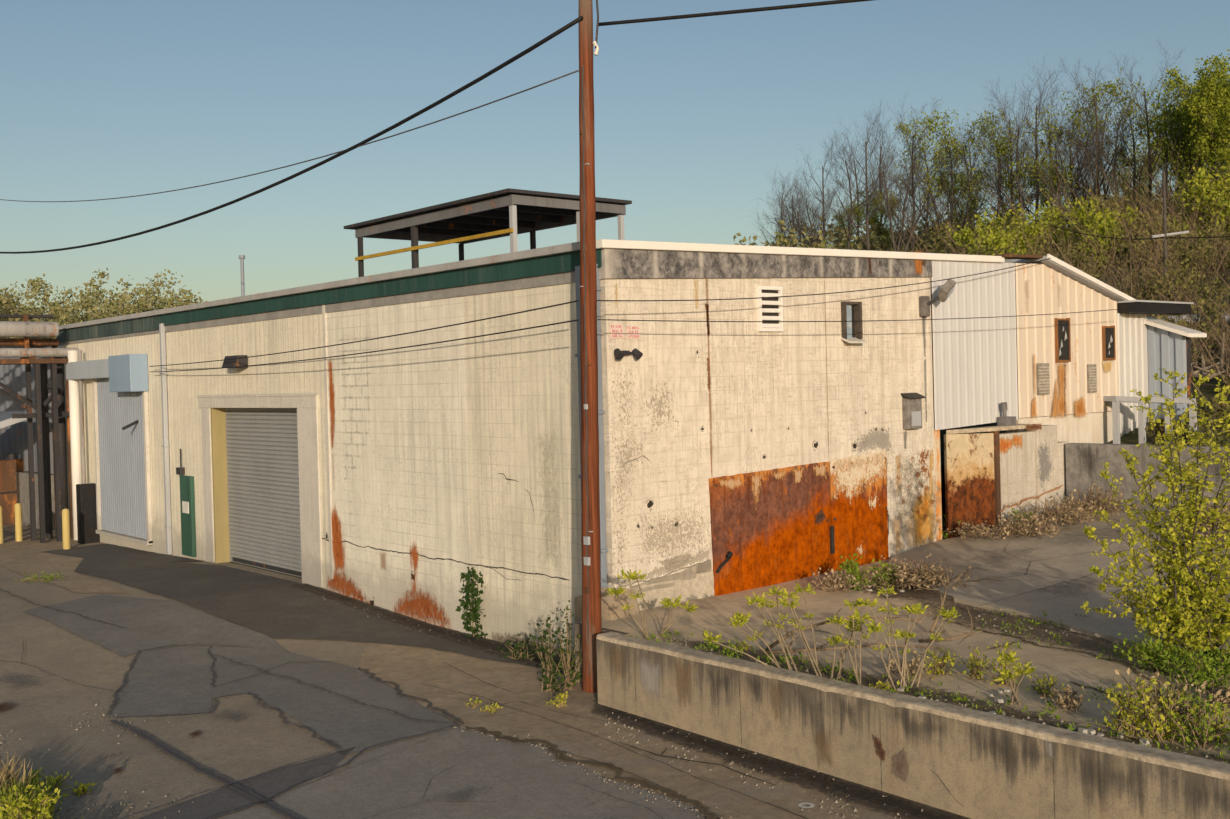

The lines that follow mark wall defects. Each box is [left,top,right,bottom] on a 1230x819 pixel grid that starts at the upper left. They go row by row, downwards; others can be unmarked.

corrosion [1000,356,1086,454]
peeling [718,440,931,546]
corrosion [328,510,370,603]
corrosion [394,546,448,627]
crack [322,538,568,581]
crack [110,720,303,819]
leakage [979,737,1052,777]